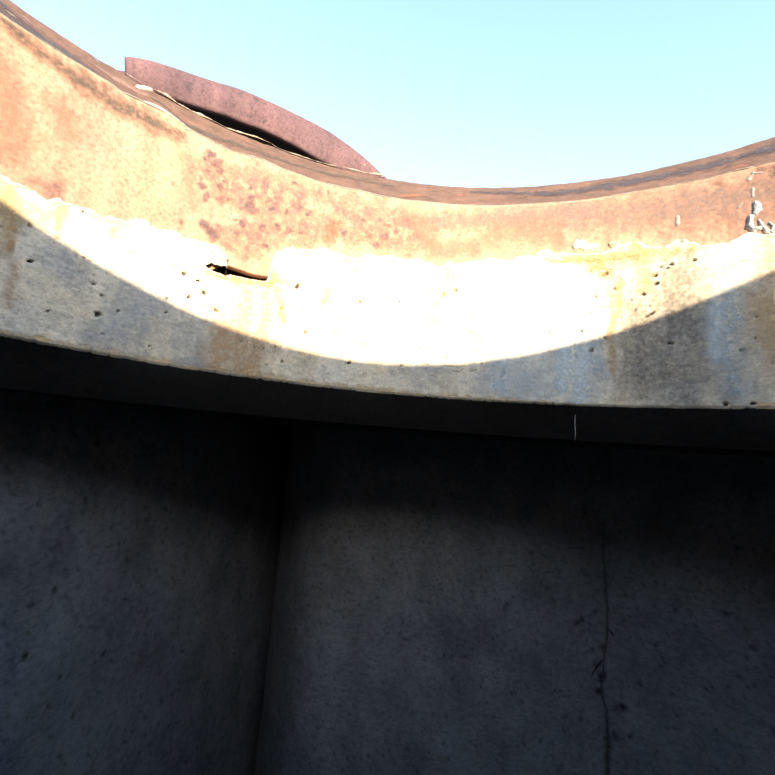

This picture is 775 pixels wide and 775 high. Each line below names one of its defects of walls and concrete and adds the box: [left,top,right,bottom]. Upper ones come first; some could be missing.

water stain [429,144,775,229]
water stain [0,253,345,388]
corrosion [207,270,291,375]
water stain [554,274,601,404]
corrosion [562,241,695,282]
crack [591,534,614,775]